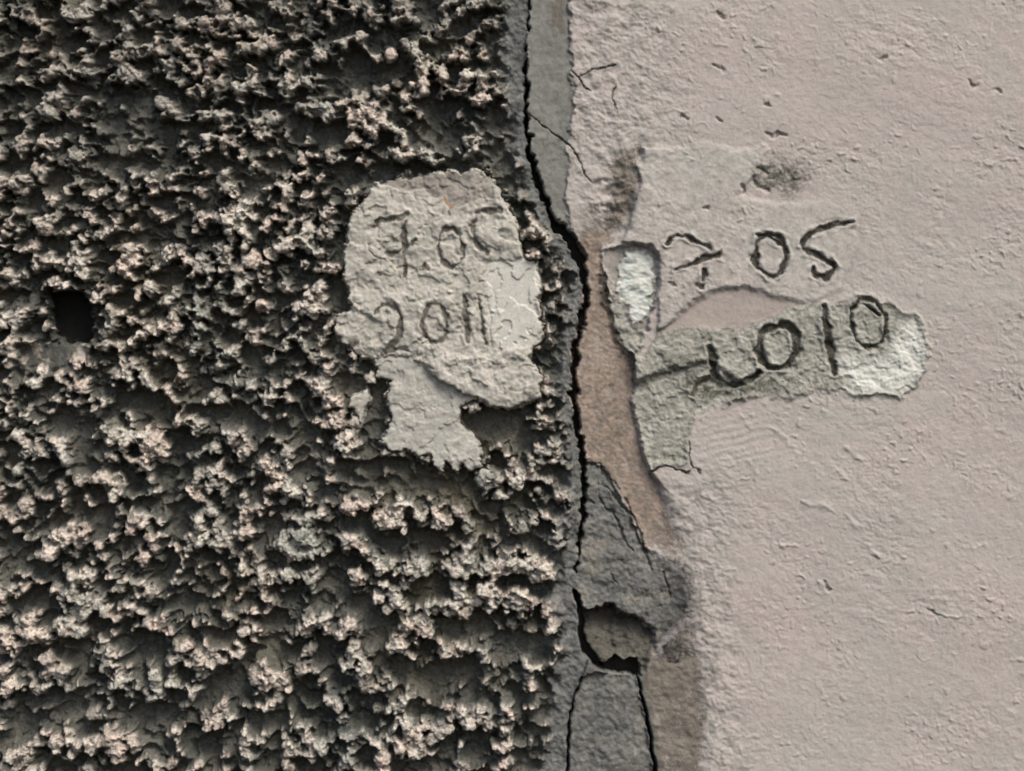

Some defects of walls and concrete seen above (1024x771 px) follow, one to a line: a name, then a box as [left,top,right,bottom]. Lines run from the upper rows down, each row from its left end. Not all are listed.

crack [522,2,648,771]
spalling [521,0,695,674]
crack [635,672,656,771]